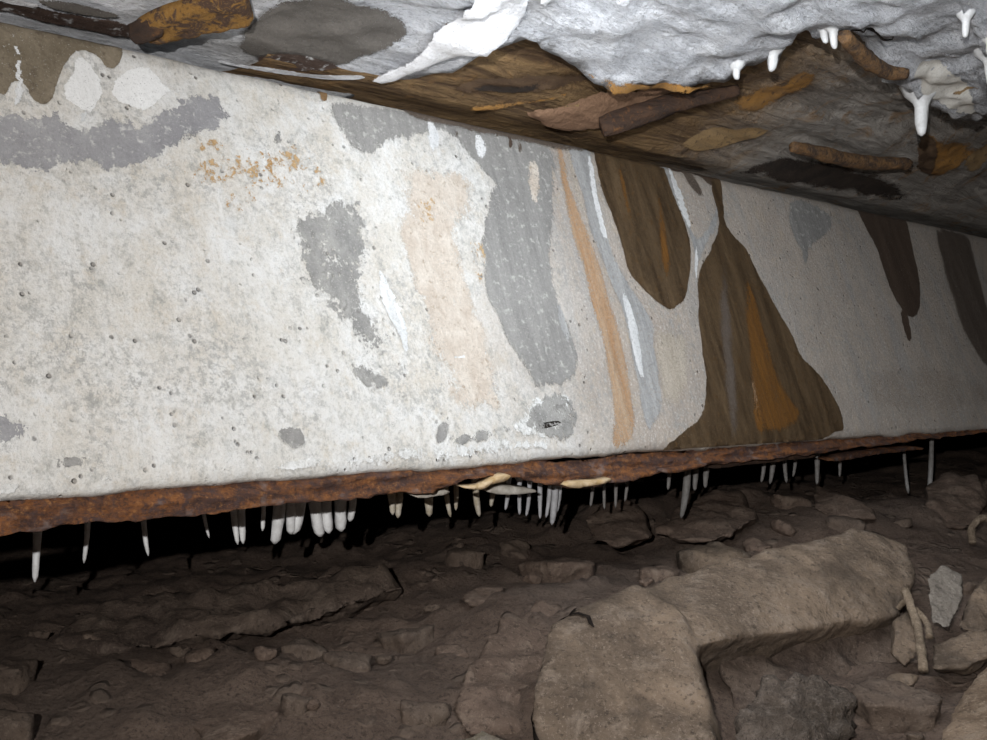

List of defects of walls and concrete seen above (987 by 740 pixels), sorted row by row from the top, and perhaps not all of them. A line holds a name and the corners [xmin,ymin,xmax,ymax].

leakage [0,0,171,122]
leakage [218,0,528,84]
peeling [958,0,987,57]
spalling [222,30,987,279]
peeling [290,192,393,357]
peeling [353,365,388,390]
leakage [348,183,578,468]
rust [557,146,636,449]
leakage [400,109,844,450]
rust [404,472,537,498]
rust [561,476,612,488]
rust [656,445,924,473]